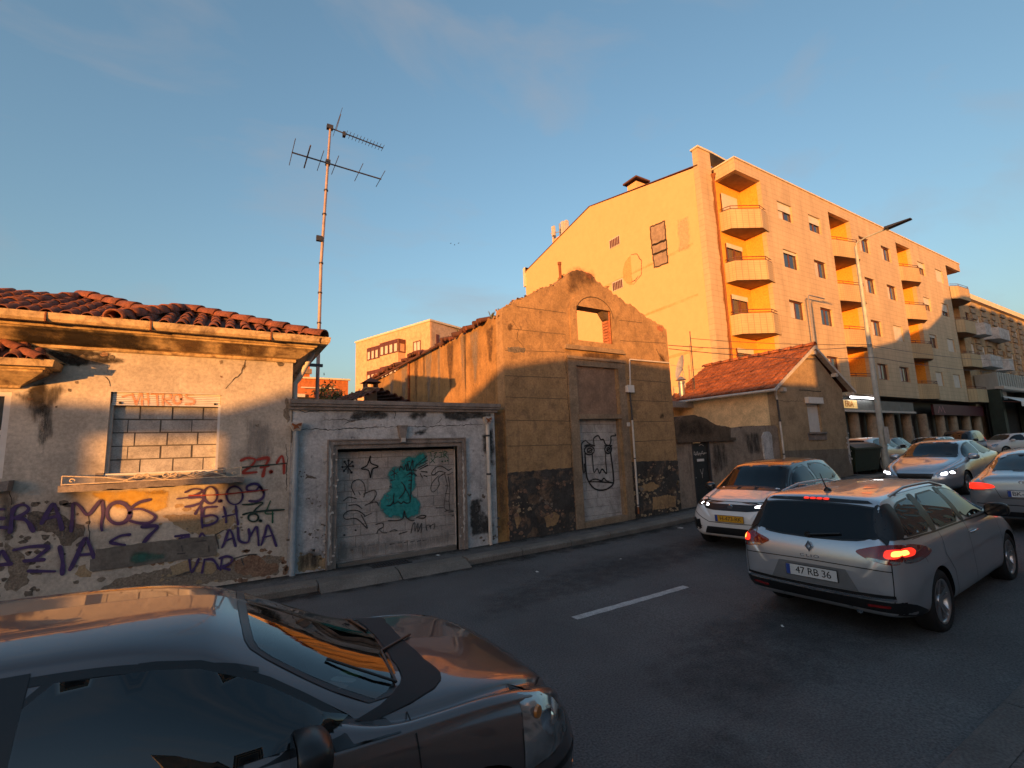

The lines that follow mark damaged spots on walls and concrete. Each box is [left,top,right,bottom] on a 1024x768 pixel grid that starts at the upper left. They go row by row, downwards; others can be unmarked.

damp [23,382,61,442]
flaking render [0,443,339,597]
peeling [458,444,576,541]
peeling [634,463,680,517]